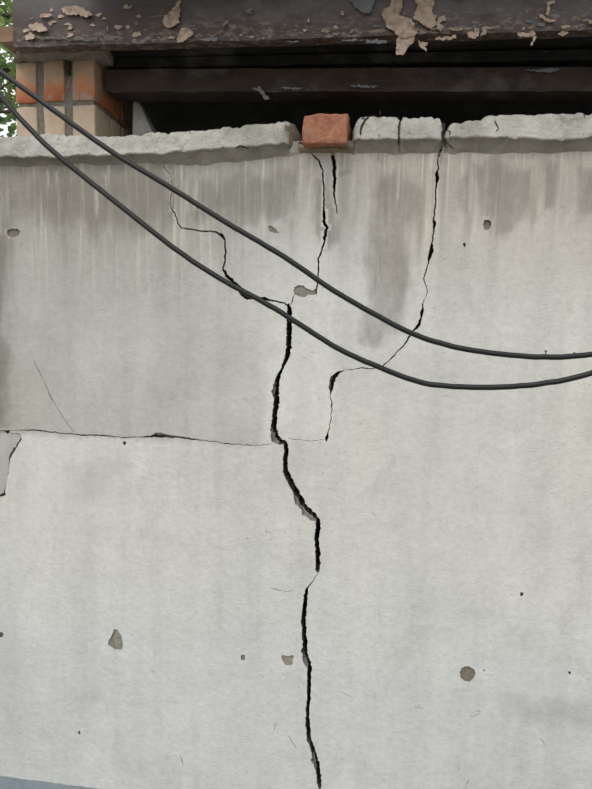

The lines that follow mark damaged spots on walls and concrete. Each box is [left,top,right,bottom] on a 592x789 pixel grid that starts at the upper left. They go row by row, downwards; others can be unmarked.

peeling [23,0,217,43]
peeling [321,0,494,55]
peeling [517,0,570,46]
crack [359,111,401,144]
peeling [0,431,22,501]
crack [0,123,453,789]
flaking render [108,629,123,650]
flaking render [460,666,485,682]